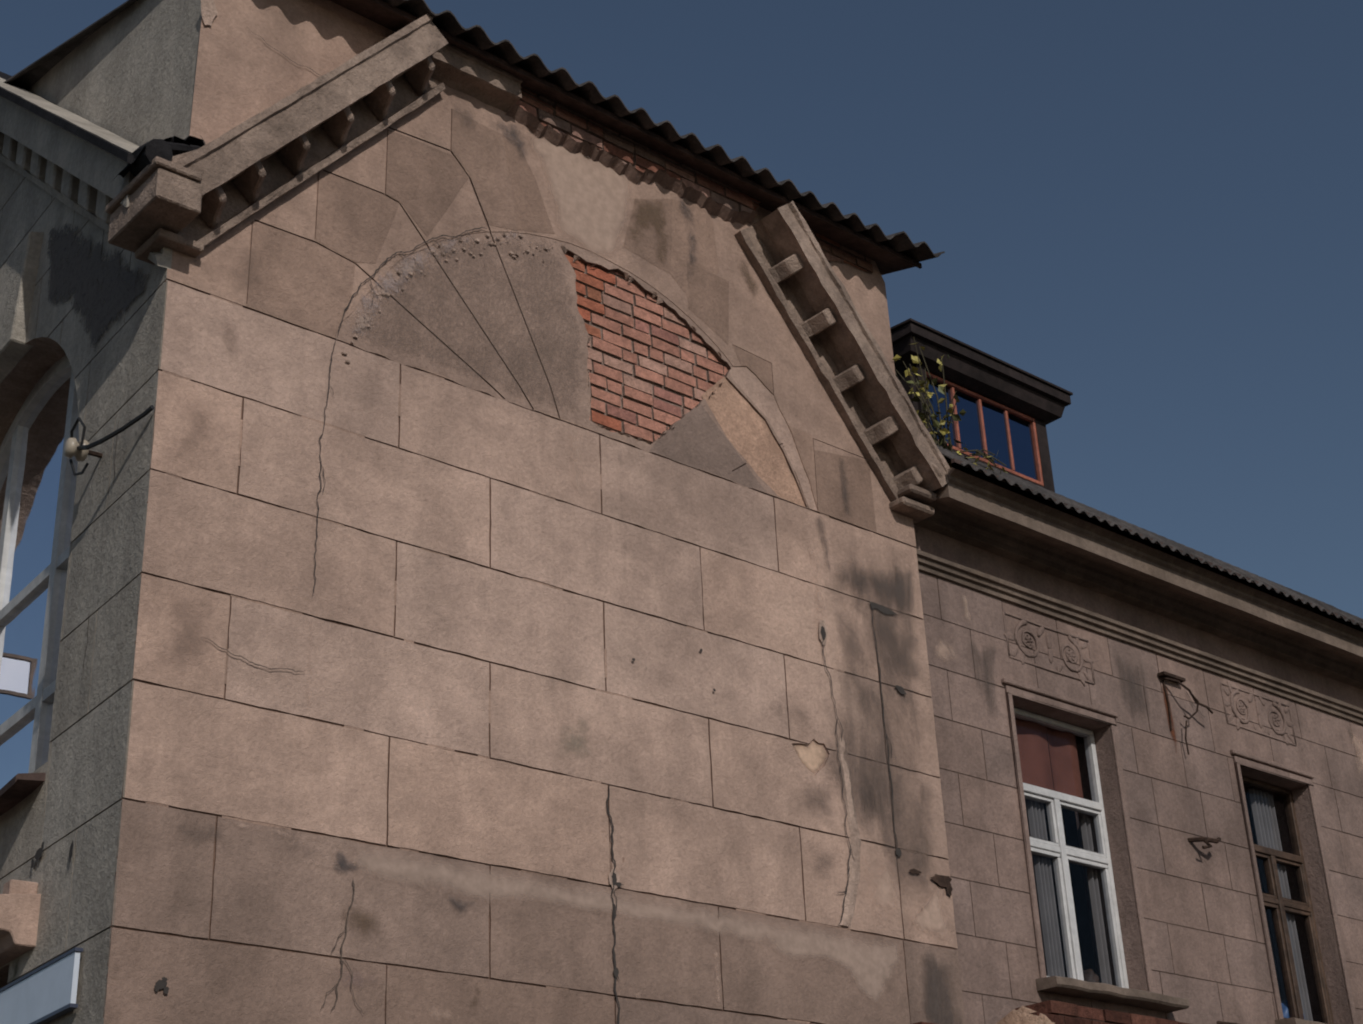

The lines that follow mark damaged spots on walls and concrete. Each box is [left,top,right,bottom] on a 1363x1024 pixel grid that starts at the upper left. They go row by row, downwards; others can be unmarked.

crack [312,227,487,596]
flaking render [342,87,805,507]
crack [320,880,363,1013]
crack [606,784,624,1024]
spalling [795,742,826,771]
crack [822,641,855,924]